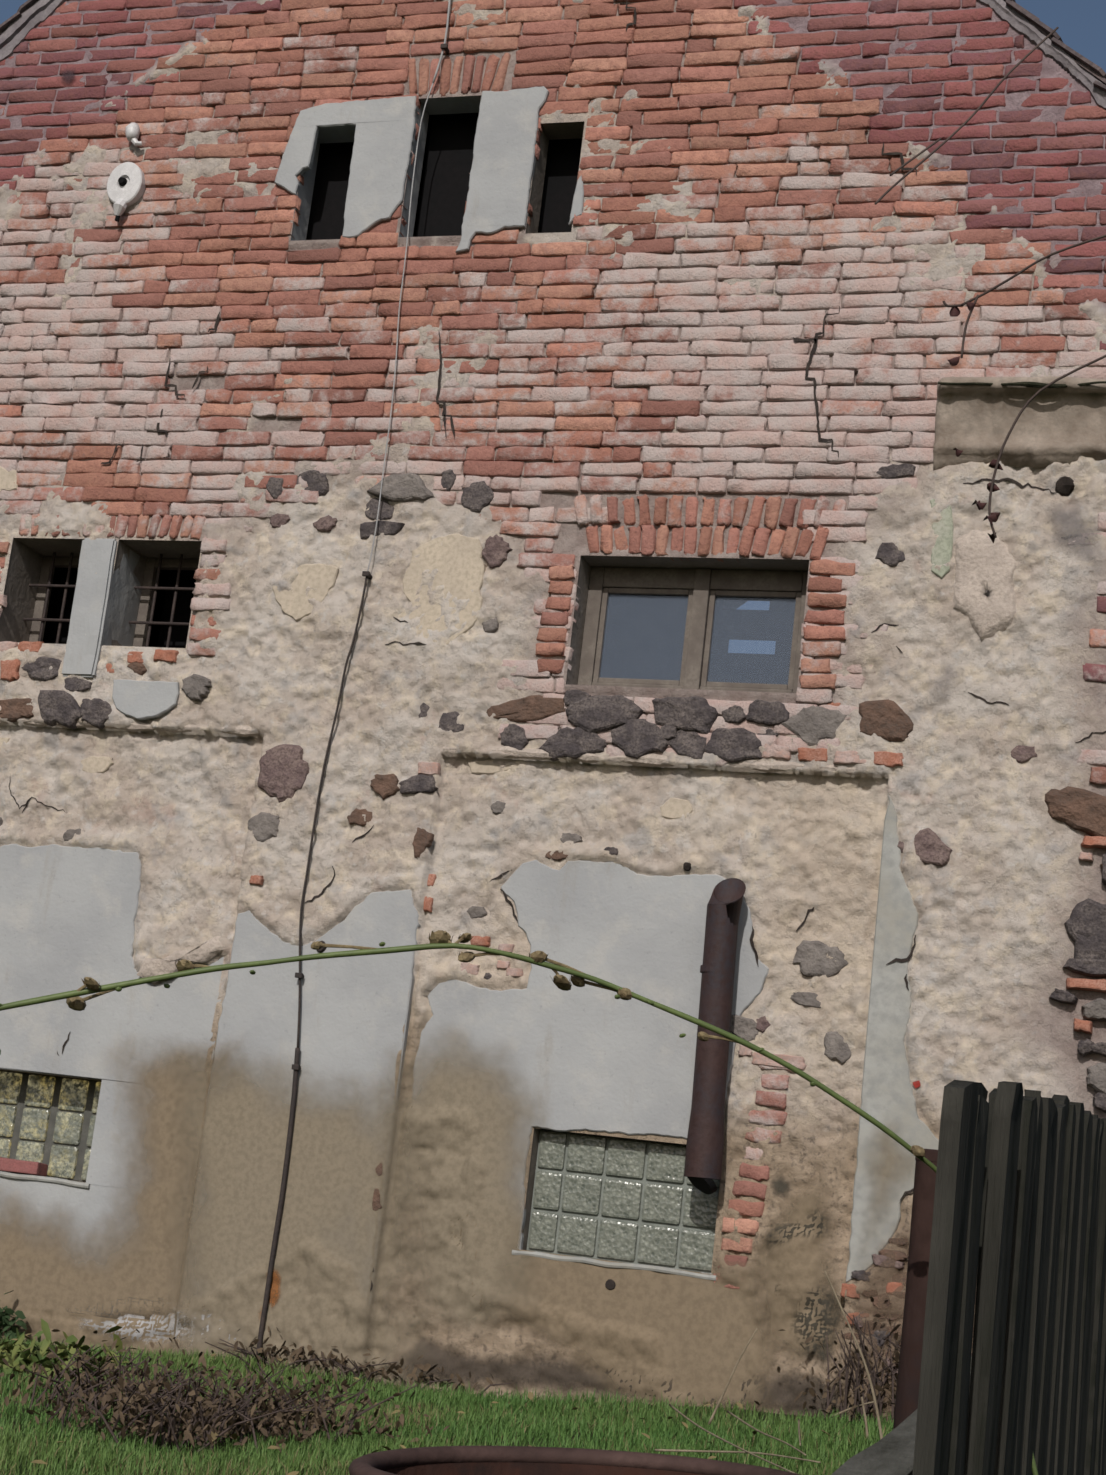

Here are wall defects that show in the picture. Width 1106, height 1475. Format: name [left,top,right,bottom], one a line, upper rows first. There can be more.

crack [613,0,637,31]
peeling [275,96,418,240]
peeling [456,86,549,254]
crack [881,142,917,175]
crack [793,306,840,457]
spalling [248,744,309,842]
spalling [347,762,441,826]
peeling [0,827,725,1255]
peeling [725,896,807,1099]
spalling [790,940,848,1008]
peeling [824,794,953,1393]
leakage [0,1054,839,1416]